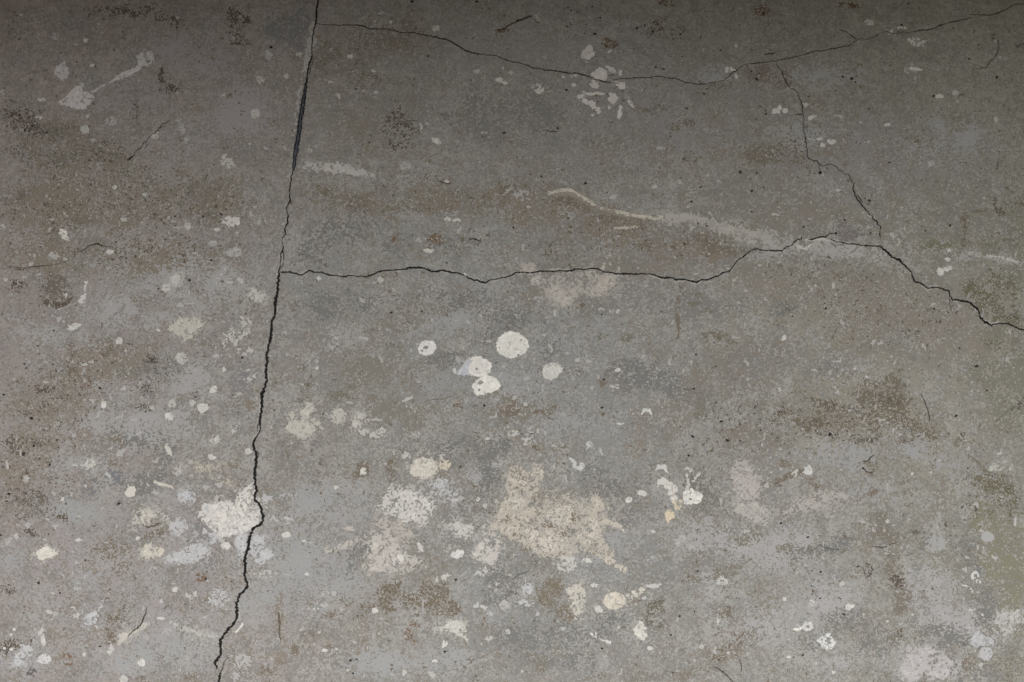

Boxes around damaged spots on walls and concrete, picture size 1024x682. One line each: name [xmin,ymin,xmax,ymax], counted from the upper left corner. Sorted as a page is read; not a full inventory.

crack [213,3,1024,682]